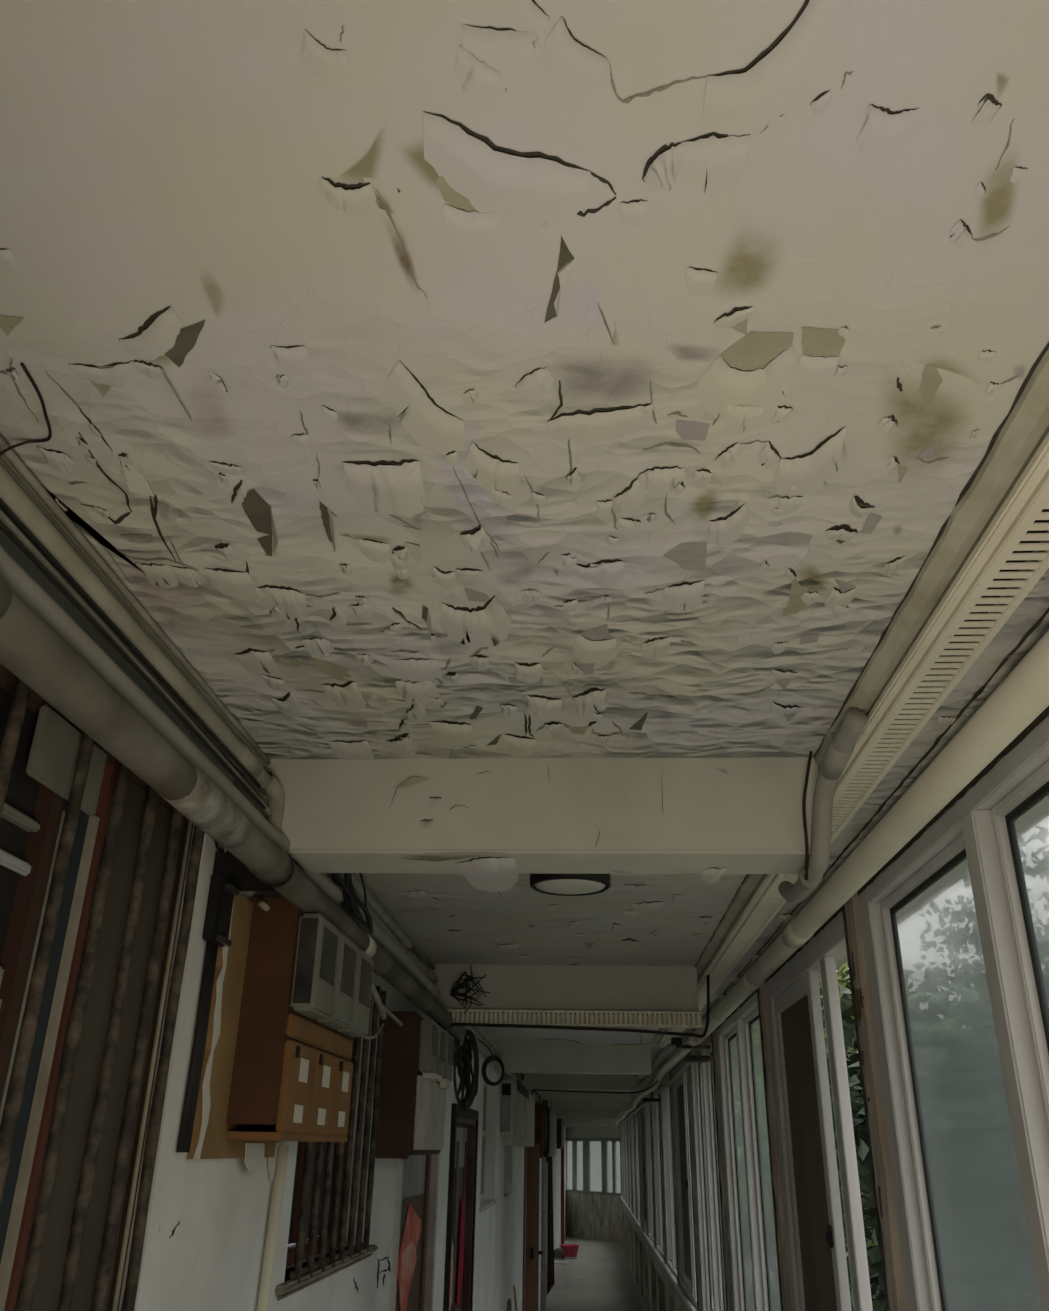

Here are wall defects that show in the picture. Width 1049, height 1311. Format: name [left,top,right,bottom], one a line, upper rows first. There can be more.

crack [498,0,679,104]
peeling [972,68,1012,128]
peeling [856,104,919,160]
peeling [950,119,1028,255]
peeling [0,315,24,335]
peeling [0,357,39,423]
peeling [68,264,278,558]
peeling [37,371,227,643]
peeling [825,495,904,544]
peeling [1034,568,1049,601]
peeling [978,643,1036,672]
peeling [382,853,519,893]